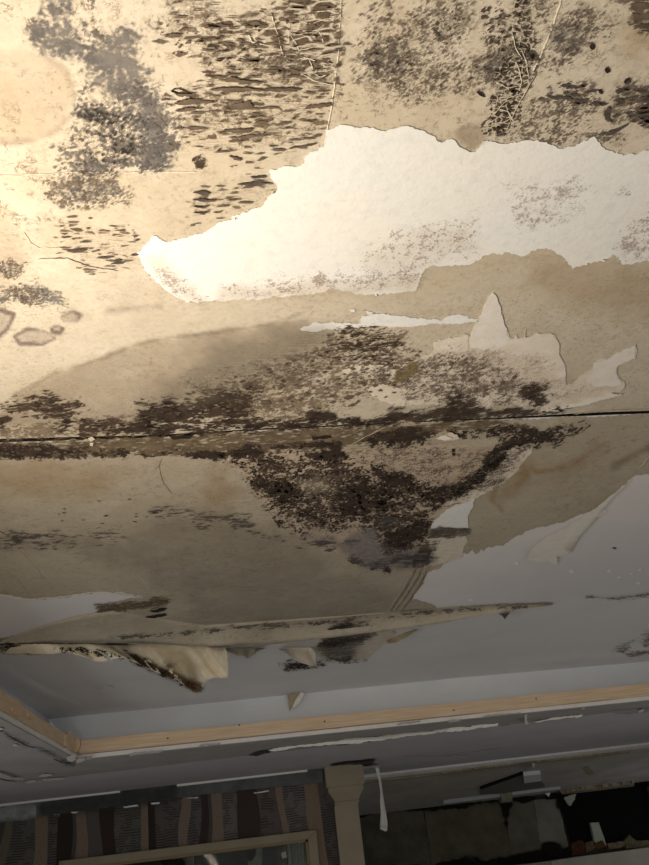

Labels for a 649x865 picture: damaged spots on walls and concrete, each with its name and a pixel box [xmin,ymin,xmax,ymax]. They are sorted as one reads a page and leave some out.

damp [26,0,183,211]
crack [152,0,351,226]
damp [349,0,649,146]
crack [480,0,541,137]
peeling [137,125,649,304]
peeling [300,293,638,413]
crack [171,433,192,441]
damp [0,323,590,574]
crack [312,421,411,450]
peeling [431,499,475,529]
peeling [0,643,265,693]
peeling [279,647,317,667]